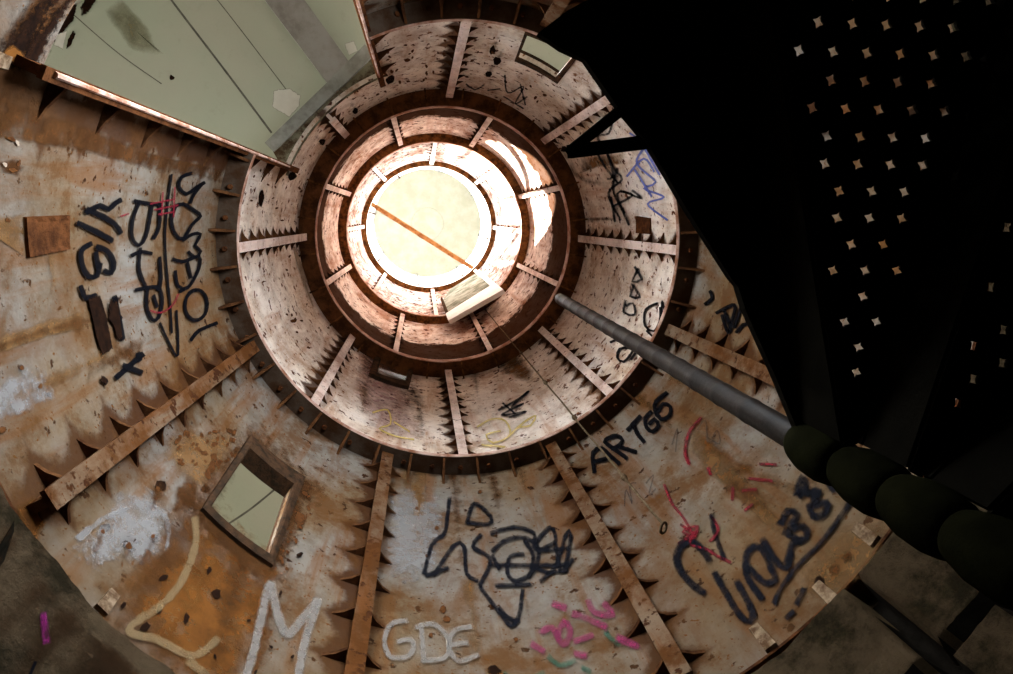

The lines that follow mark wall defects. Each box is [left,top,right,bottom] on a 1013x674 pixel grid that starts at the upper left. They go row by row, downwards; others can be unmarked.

spalling [54,0,96,49]
peeling [273,89,300,117]
rust [125,460,313,674]